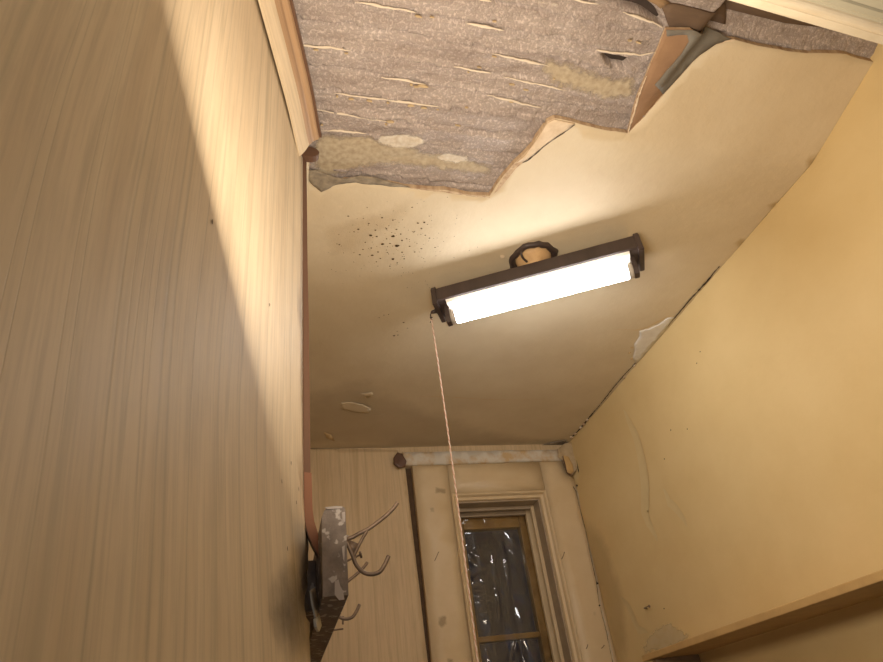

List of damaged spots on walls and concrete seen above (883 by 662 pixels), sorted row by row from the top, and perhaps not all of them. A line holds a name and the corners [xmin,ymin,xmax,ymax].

spalling [293,0,878,192]
peeling [617,316,674,363]